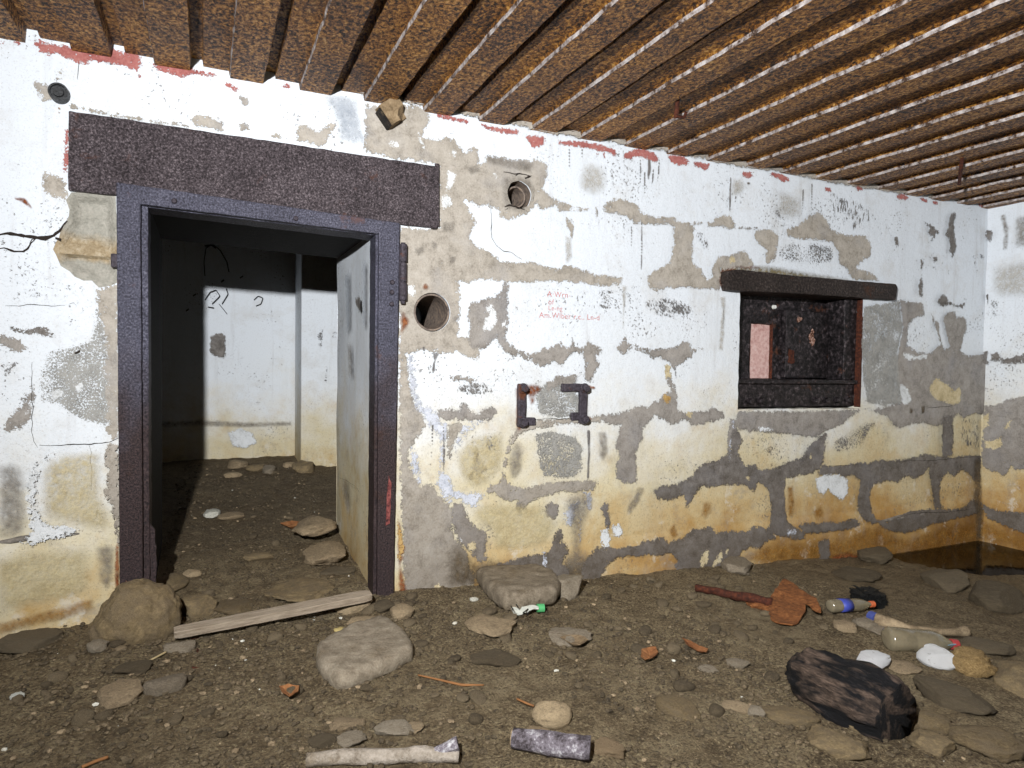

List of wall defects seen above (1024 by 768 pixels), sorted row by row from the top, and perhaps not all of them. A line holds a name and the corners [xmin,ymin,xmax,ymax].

crack [0,220,67,252]
spalling [0,170,119,546]
flaking render [360,92,1024,602]
leakage [3,453,101,545]
leakage [453,552,496,583]
leakage [408,347,550,547]
leakage [563,492,592,575]
leakage [587,430,606,478]
leakage [600,523,623,547]
leakage [815,474,848,501]
leakage [974,461,983,538]
leakage [1,601,89,631]